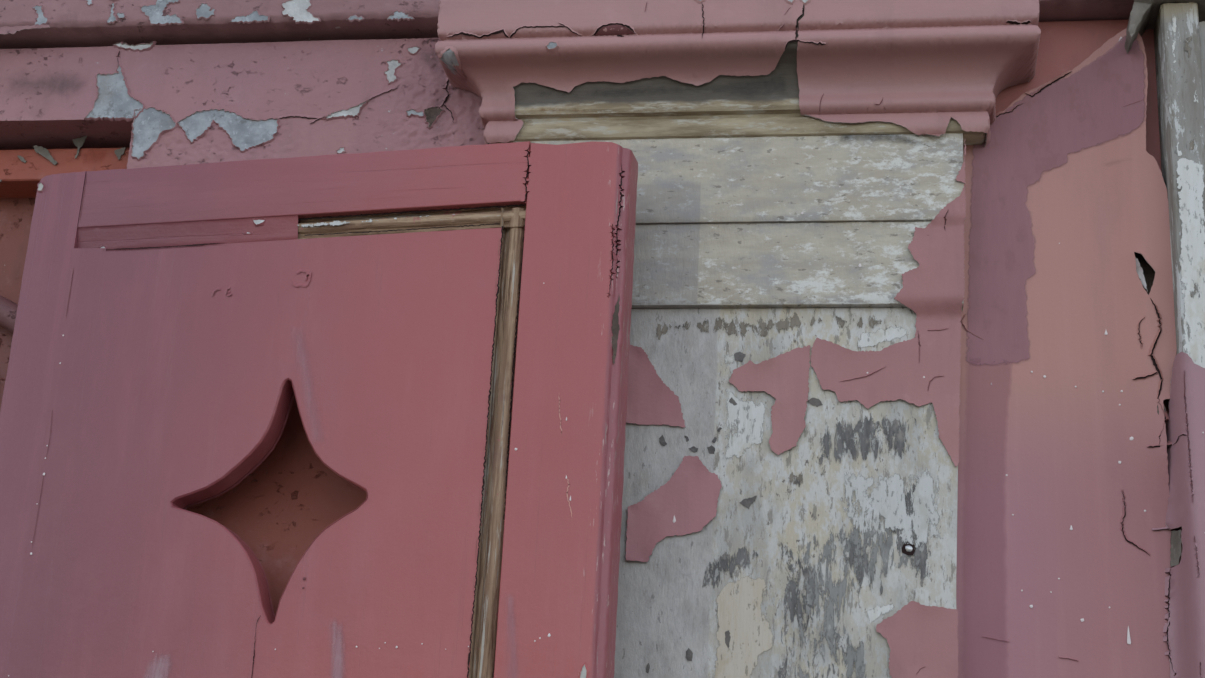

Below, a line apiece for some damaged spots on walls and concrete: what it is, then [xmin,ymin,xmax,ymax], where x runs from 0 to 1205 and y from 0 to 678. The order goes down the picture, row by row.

peeling [0,5,50,35]
peeling [107,0,216,26]
peeling [229,0,321,24]
peeling [387,11,415,22]
peeling [112,41,157,52]
peeling [84,64,281,161]
peeling [1135,258,1148,292]
peeling [611,141,966,678]
crack [1132,298,1194,503]
crack [1120,489,1203,678]